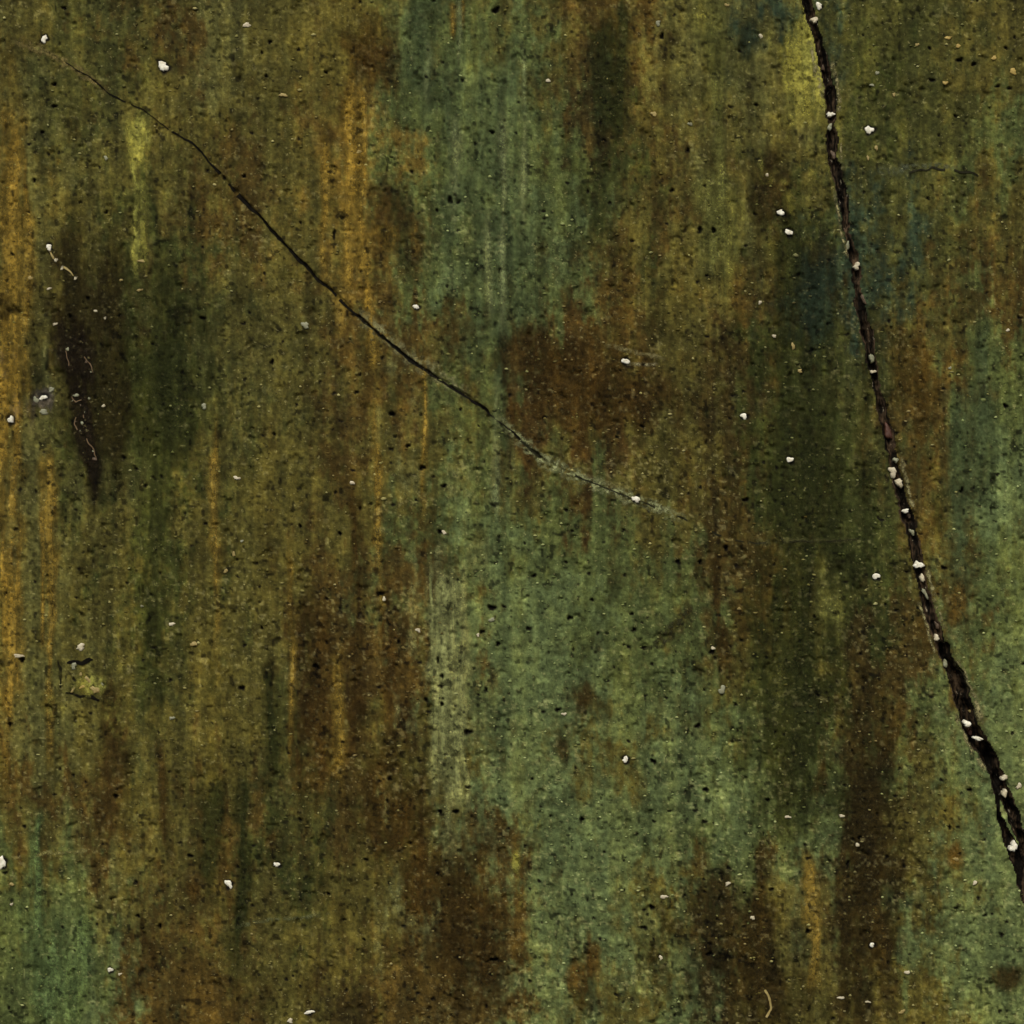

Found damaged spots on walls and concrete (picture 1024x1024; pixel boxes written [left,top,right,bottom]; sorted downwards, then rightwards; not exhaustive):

water stain [740,22,758,59]
crack [22,44,687,521]
water stain [54,163,206,702]
corrosion [208,446,220,586]
corrosion [373,420,383,589]
corrosion [502,335,676,440]
water stain [742,149,903,979]
crack [802,0,1024,903]
corrosion [333,666,344,769]
corrosion [367,777,505,1004]
water stain [676,854,788,1024]